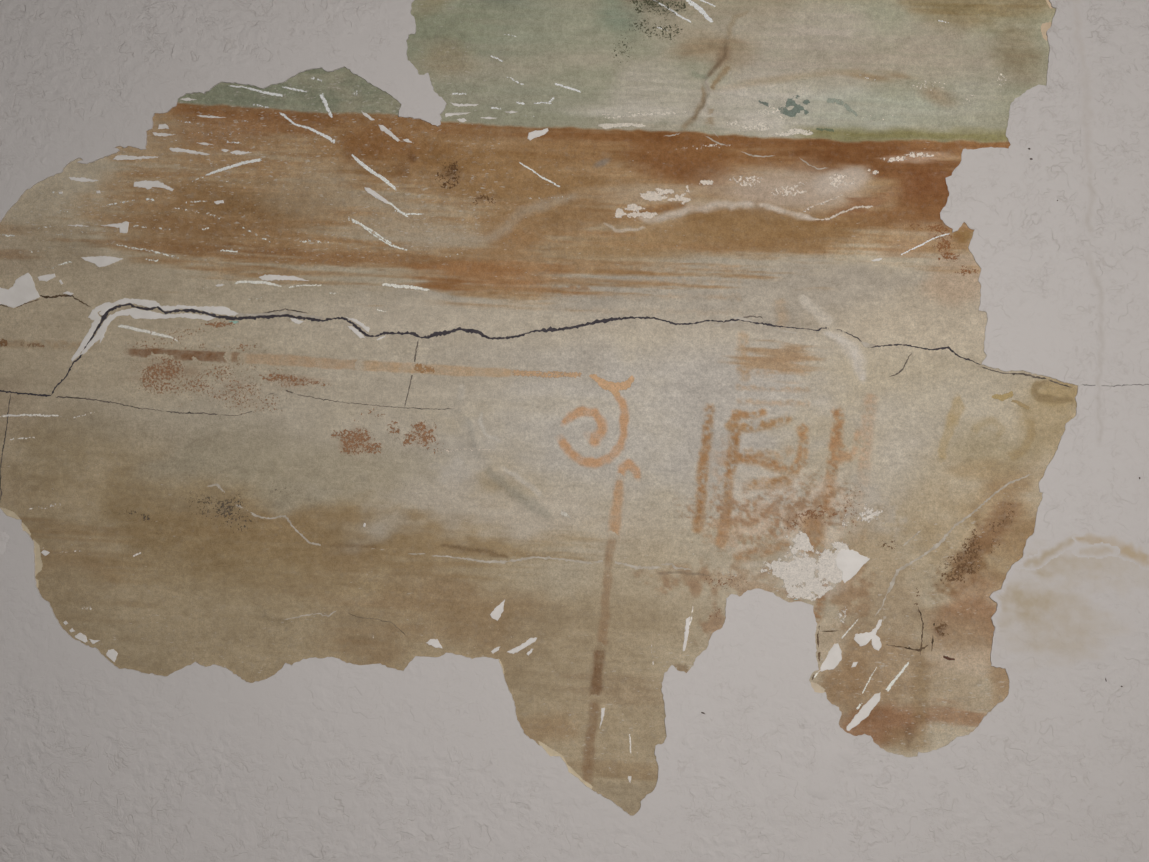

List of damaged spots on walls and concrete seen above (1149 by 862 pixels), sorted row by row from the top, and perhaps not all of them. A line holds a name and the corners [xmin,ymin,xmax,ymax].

peeling [686,0,713,22]
peeling [280,113,335,143]
peeling [352,154,390,184]
rust [903,223,978,274]
peeling [382,283,429,291]
peeling [118,325,178,341]
rust [116,321,340,414]
crack [0,294,1149,500]
rust [328,408,449,461]
rust [781,490,864,532]